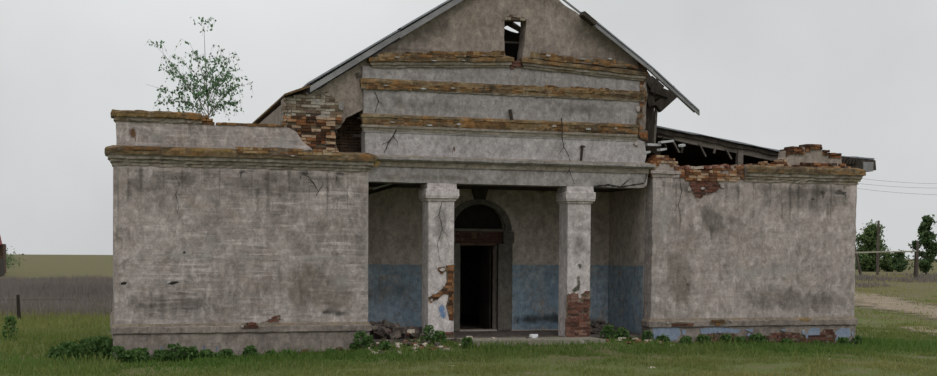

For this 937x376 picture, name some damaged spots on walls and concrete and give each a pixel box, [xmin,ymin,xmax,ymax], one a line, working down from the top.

flaking render [235,92,344,157]
crack [557,118,647,188]
flaking render [687,181,725,199]
flaking render [428,265,454,321]
flaking render [565,291,591,337]